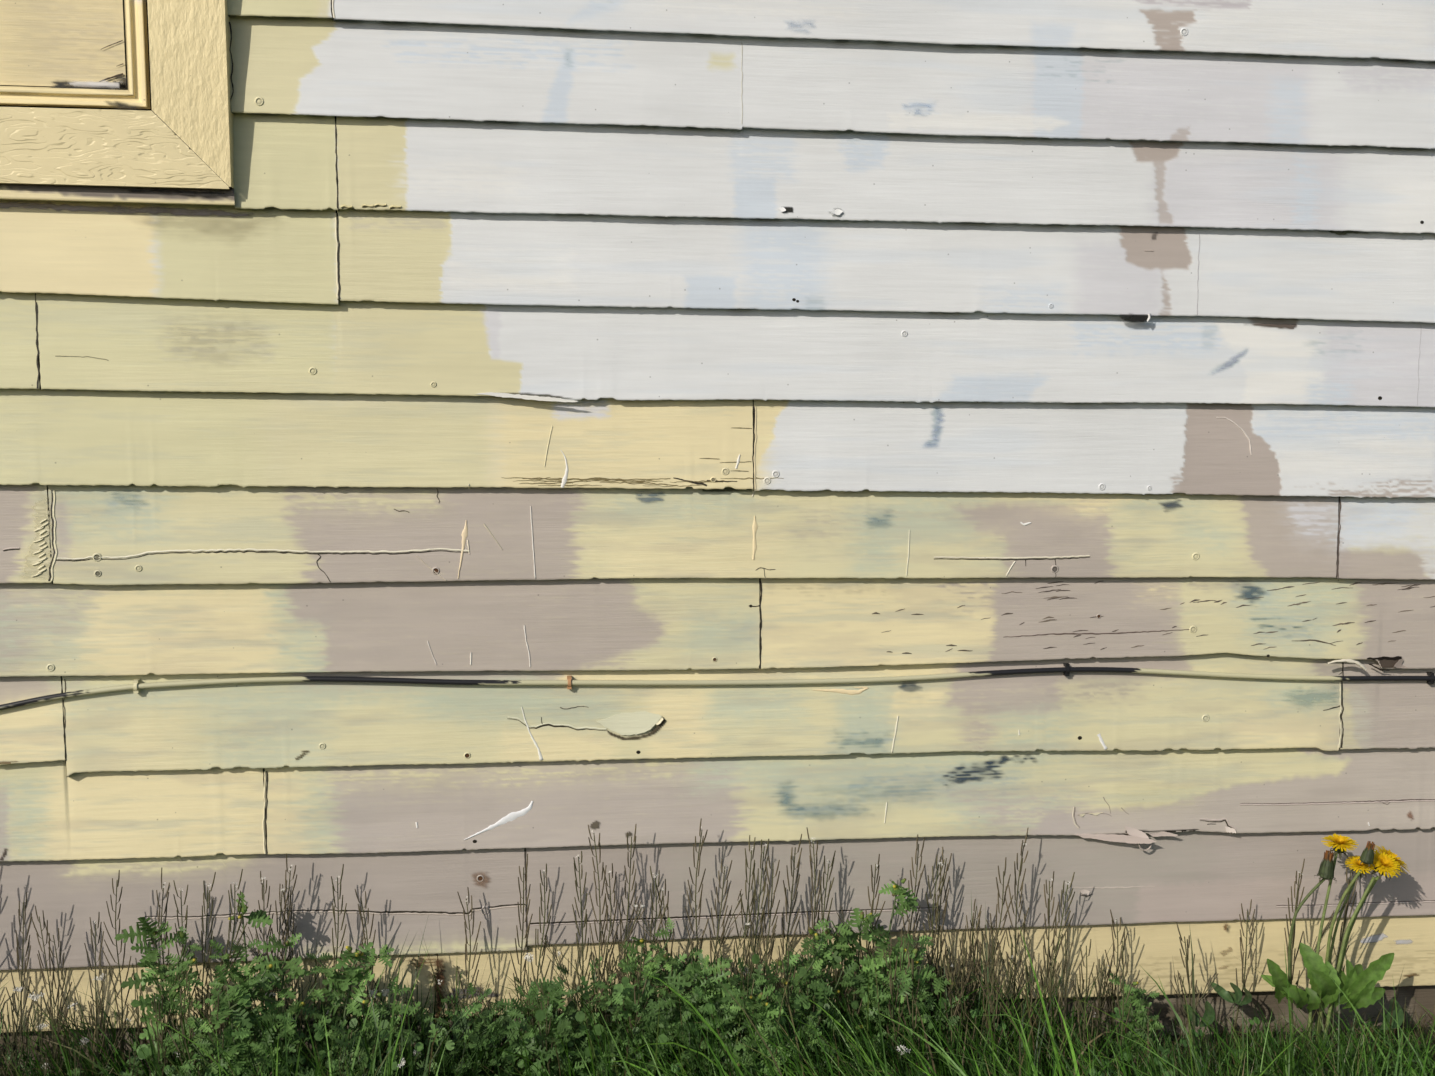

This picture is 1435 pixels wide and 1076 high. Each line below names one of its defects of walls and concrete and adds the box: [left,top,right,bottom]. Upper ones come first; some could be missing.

peeling [478,392,578,402]
crack [3,490,470,581]
crack [872,609,924,654]
crack [934,499,1435,748]
crack [507,706,607,731]